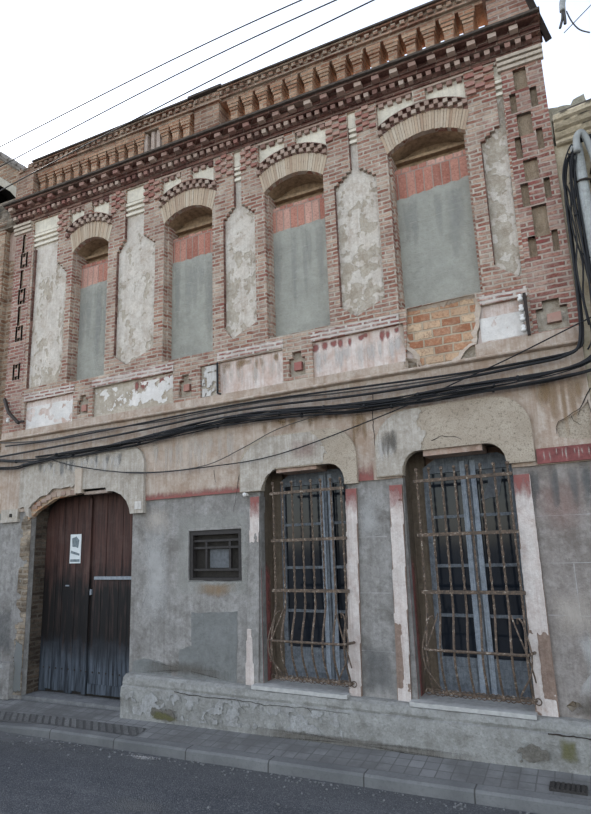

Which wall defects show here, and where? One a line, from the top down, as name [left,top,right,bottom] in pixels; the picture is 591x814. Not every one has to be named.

peeling [29,231,66,388]
peeling [115,203,155,364]
peeling [225,171,257,338]
peeling [336,132,385,316]
spalling [399,294,527,374]
peeling [26,399,73,429]
peeling [96,375,173,414]
crack [556,388,591,431]
spalling [517,743,550,763]